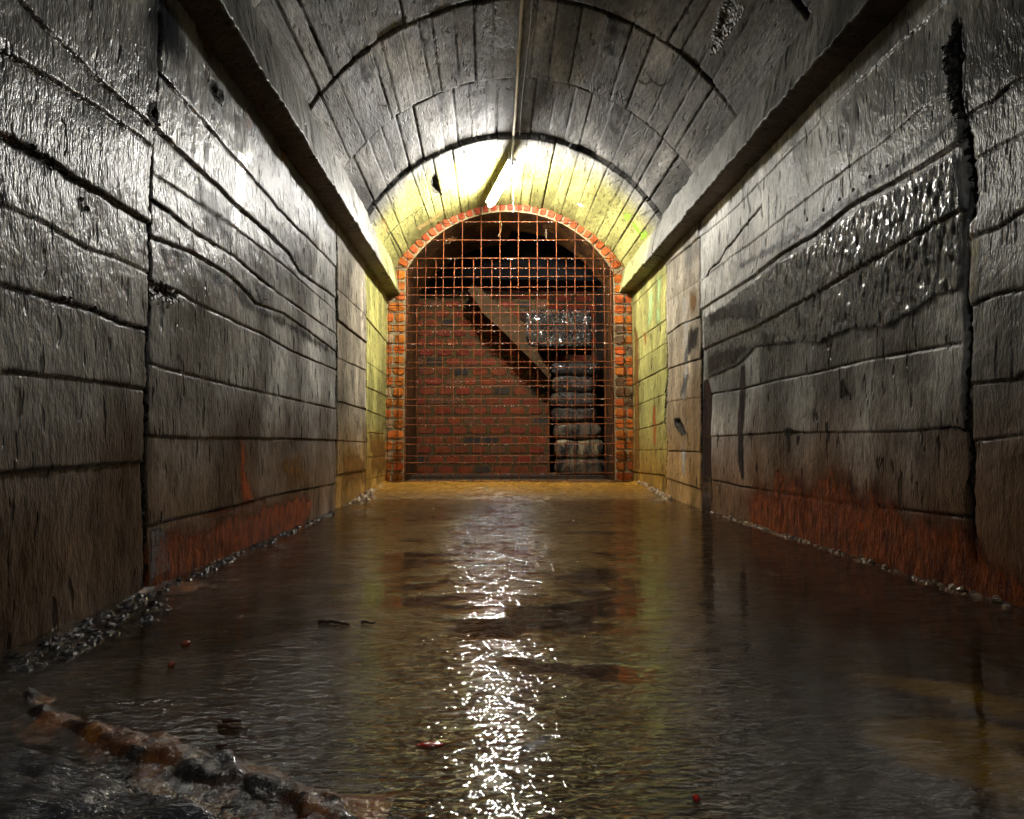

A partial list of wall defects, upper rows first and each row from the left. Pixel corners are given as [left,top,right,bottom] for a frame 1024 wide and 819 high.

crack [952,105,979,216]
crack [940,306,980,563]